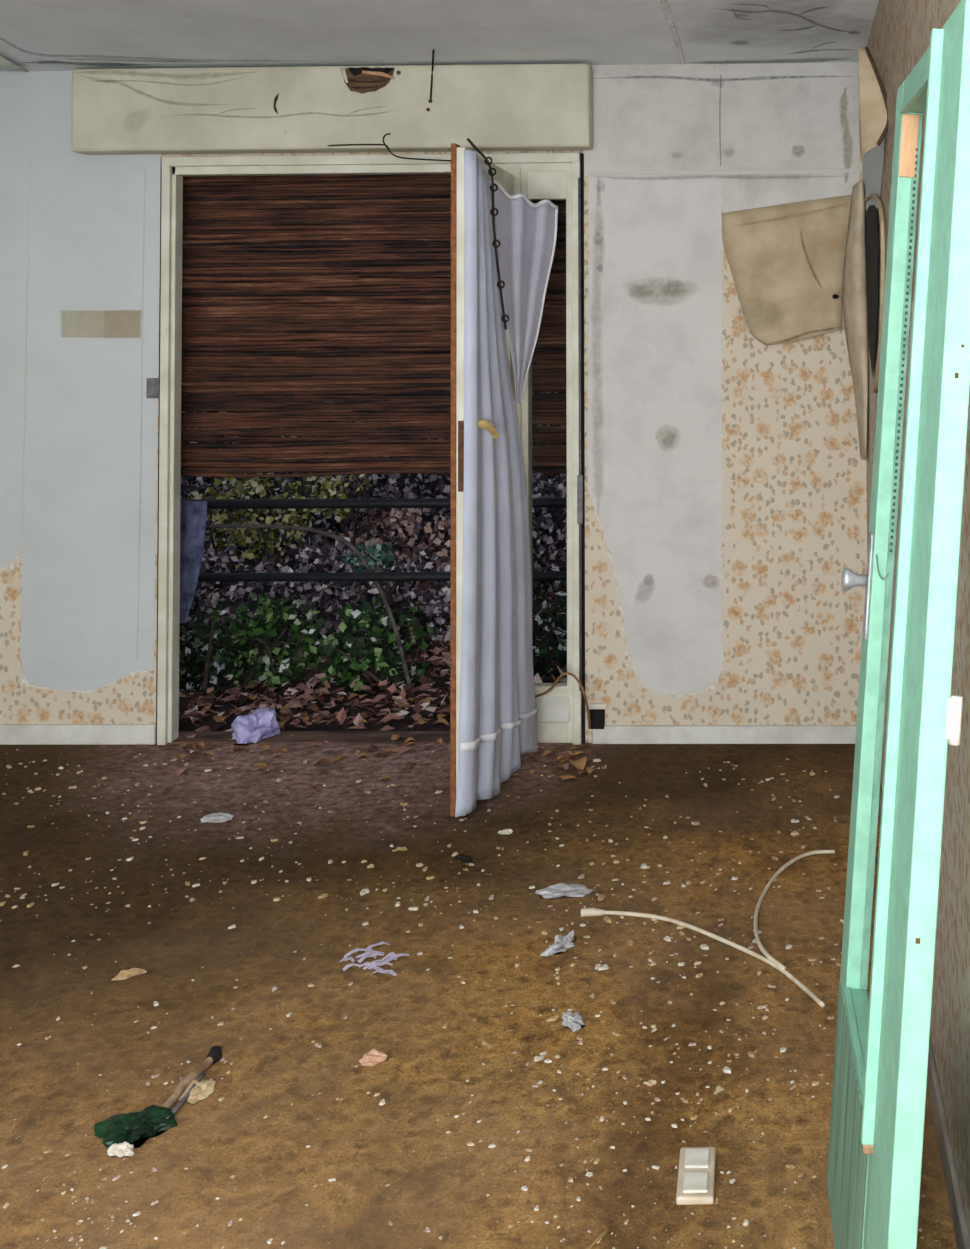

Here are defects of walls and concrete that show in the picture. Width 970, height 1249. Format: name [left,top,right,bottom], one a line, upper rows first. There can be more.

crack [714,4,854,54]
spalling [340,67,395,94]